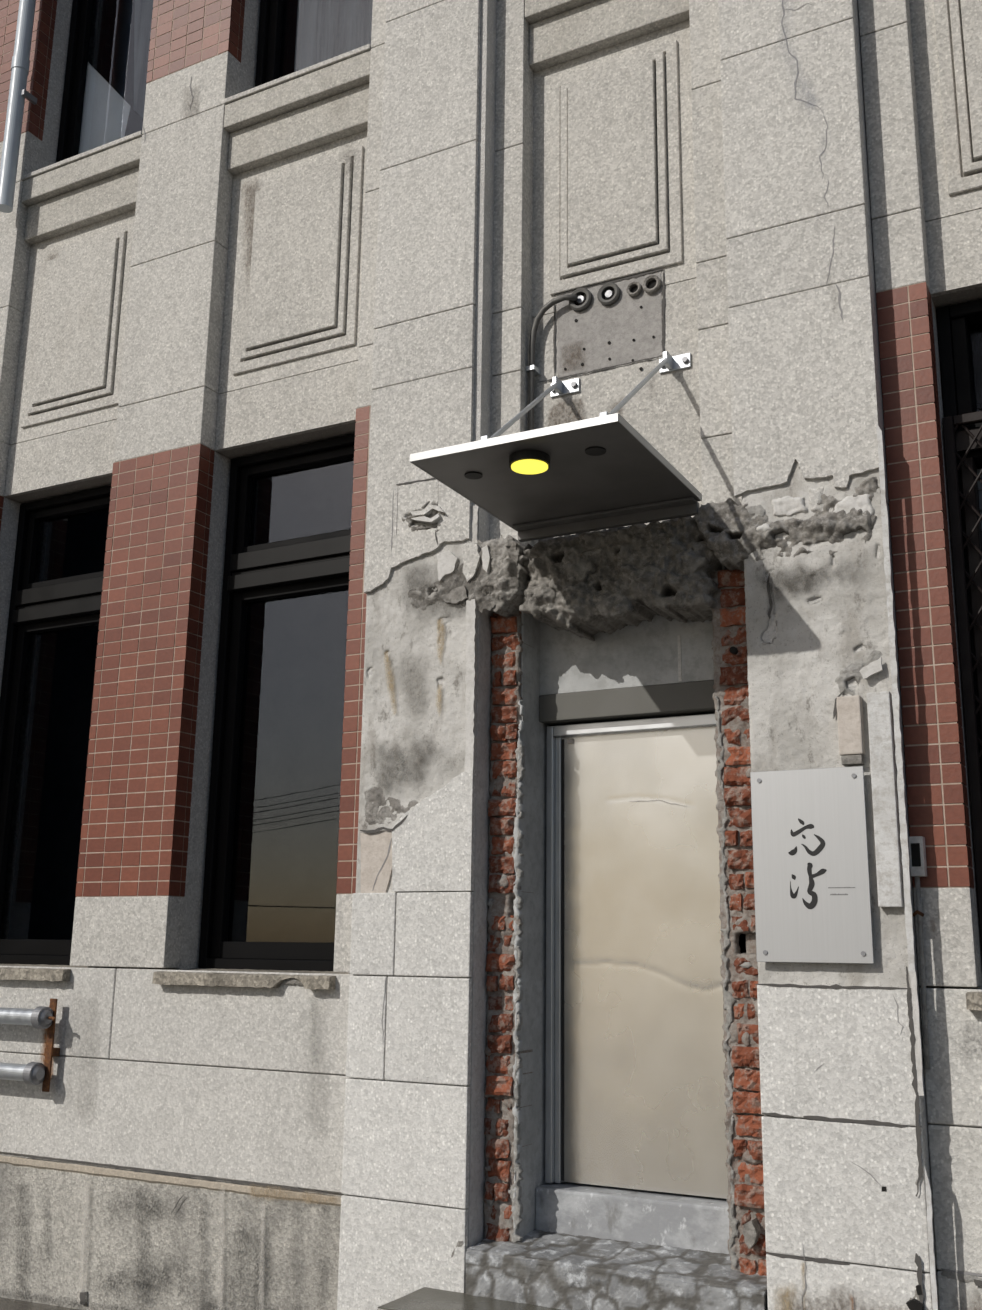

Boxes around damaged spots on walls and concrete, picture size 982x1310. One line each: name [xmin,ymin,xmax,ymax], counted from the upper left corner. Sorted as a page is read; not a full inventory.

crack [781,0,843,320]
spalling [356,478,534,1243]
spalling [694,460,923,1276]